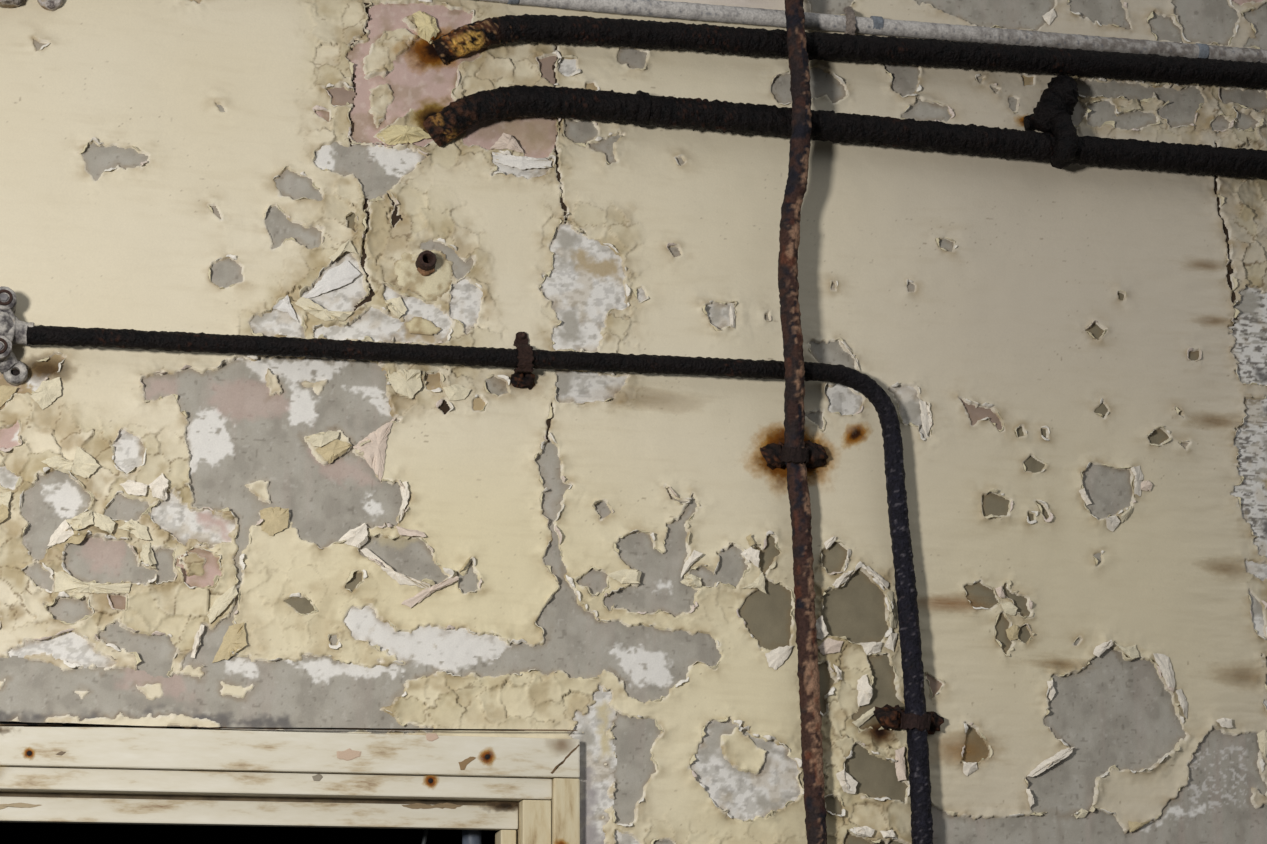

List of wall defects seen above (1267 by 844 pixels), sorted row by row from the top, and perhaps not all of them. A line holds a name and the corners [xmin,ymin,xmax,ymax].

crack [347,1,372,147]
peeling [264,0,490,338]
corrosion [414,102,444,134]
corrosion [408,32,453,68]
crack [551,45,559,87]
crack [554,118,569,224]
crack [1214,143,1240,331]
corrosion [754,427,787,485]
corrosion [845,425,867,445]
peeling [0,352,804,838]
peeling [816,536,910,844]
peeling [931,640,1267,844]